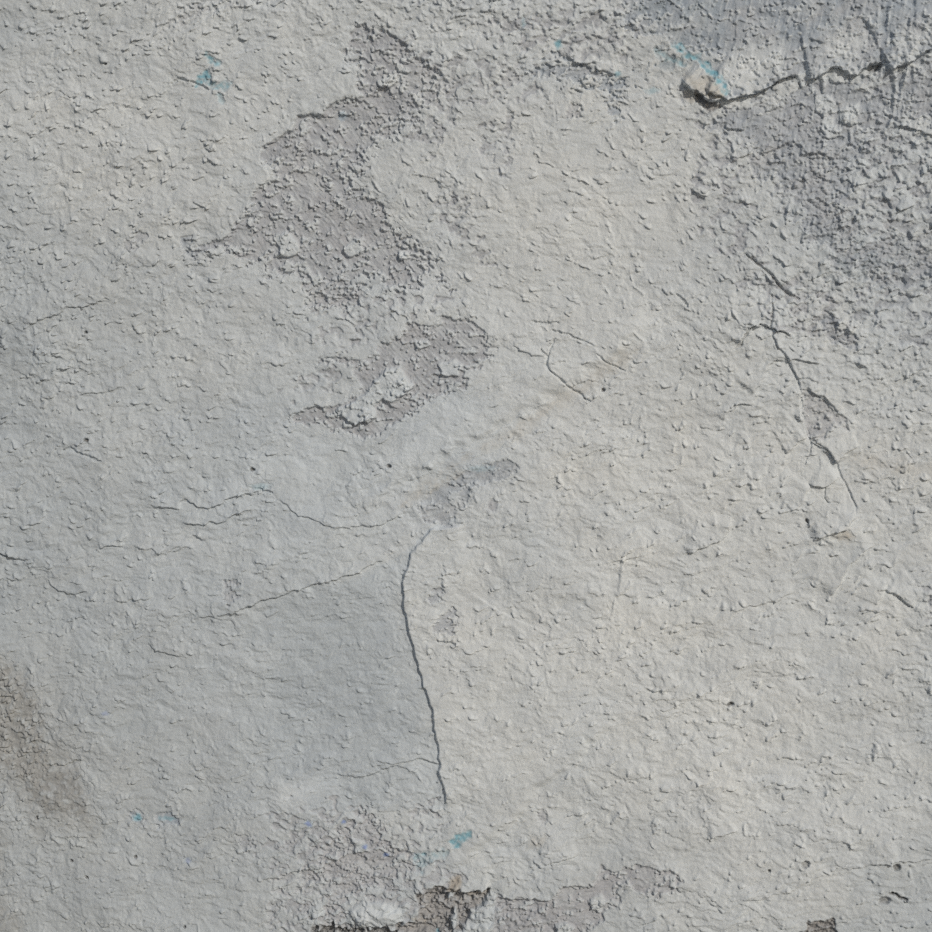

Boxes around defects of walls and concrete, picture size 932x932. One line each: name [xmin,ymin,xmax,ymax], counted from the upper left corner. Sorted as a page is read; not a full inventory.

peeling [179,20,451,315]
peeling [617,0,932,289]
peeling [288,316,494,441]
crack [734,254,857,540]
peeling [293,806,681,932]
spalling [805,918,837,932]